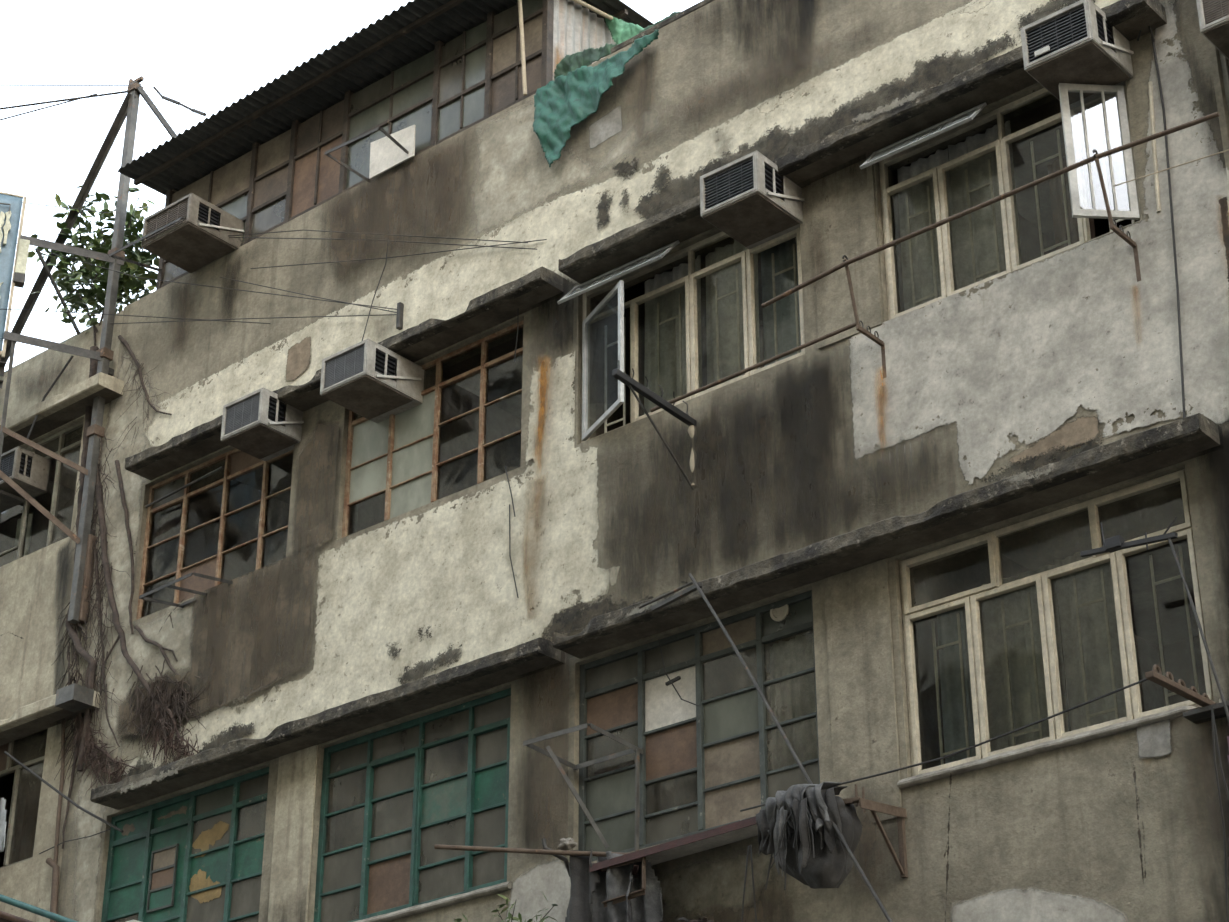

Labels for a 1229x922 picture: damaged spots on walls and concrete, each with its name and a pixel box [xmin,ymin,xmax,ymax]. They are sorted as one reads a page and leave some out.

damp [595,0,1095,228]
damp [1195,69,1226,170]
peeling [849,0,1229,485]
corrosion [524,477,544,617]
corrosion [535,358,549,455]
peeling [75,0,1050,922]
damp [542,363,936,640]
damp [1209,417,1229,593]
damp [1211,722,1229,836]